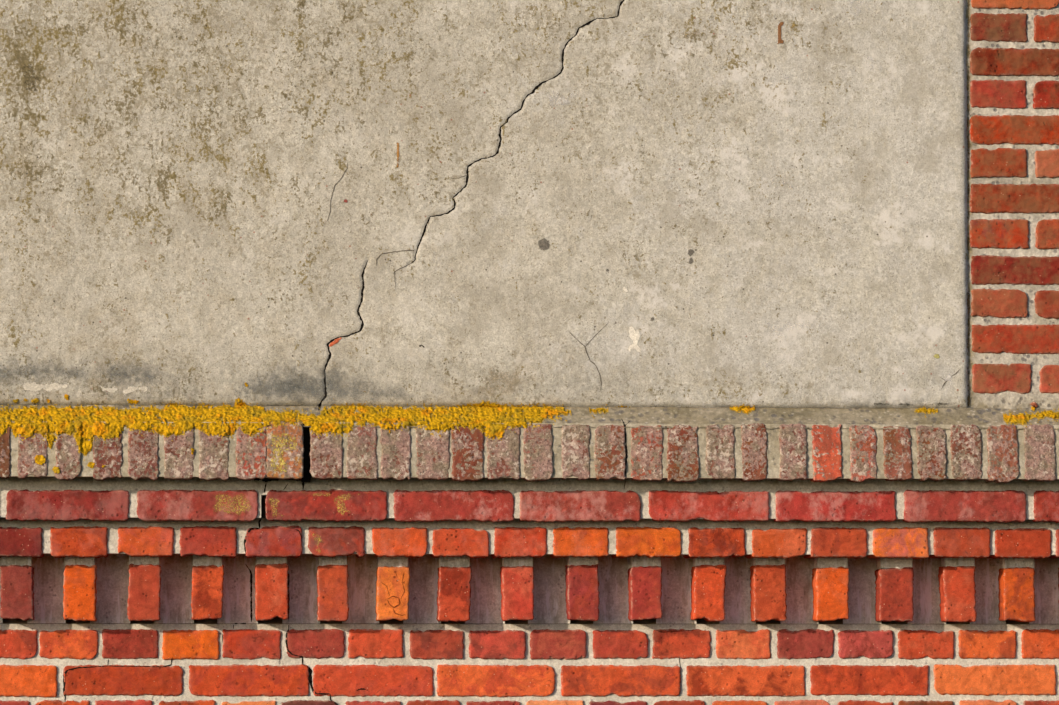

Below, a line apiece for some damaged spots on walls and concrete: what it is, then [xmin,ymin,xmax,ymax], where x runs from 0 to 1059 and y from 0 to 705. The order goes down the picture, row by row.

crack [219,0,624,642]
crack [622,420,630,489]